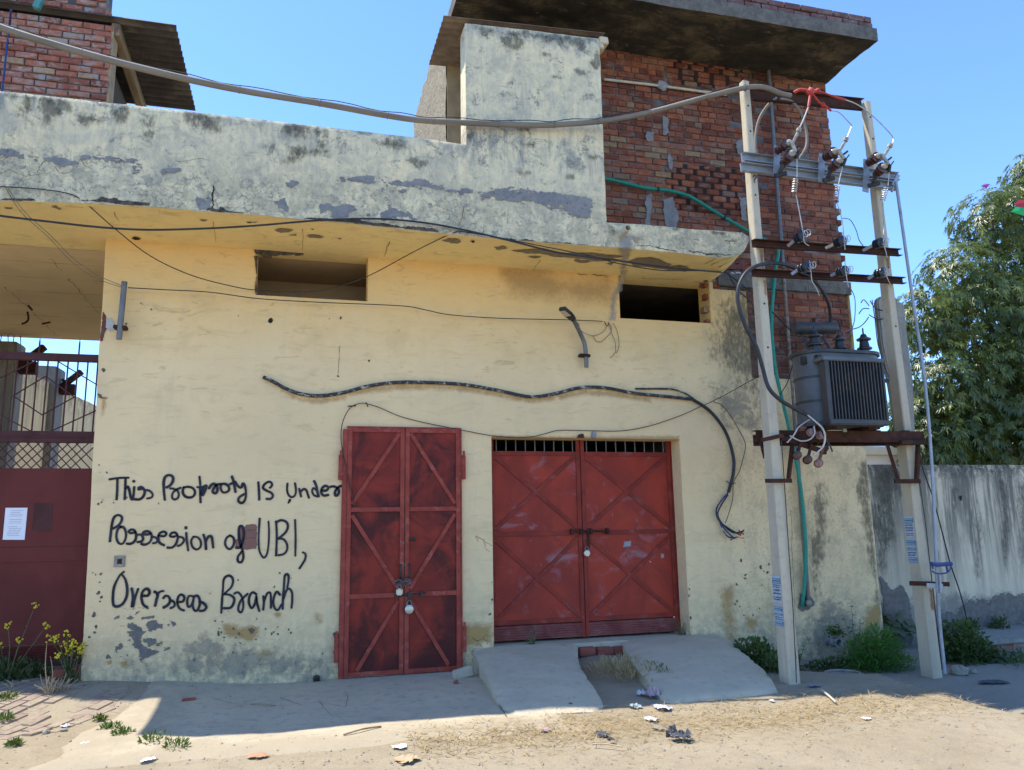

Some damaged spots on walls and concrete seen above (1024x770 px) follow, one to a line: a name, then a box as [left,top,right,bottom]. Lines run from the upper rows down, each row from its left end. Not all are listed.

water stain [26,97,68,120]
water stain [185,112,215,128]
water stain [285,124,324,160]
peeling [0,148,145,174]
spalling [82,197,150,206]
peeling [195,197,256,223]
peeling [275,203,474,244]
peeling [336,175,595,219]
water stain [714,290,758,432]
water stain [941,591,1024,627]
peeling [106,607,176,661]
water stain [803,600,862,659]